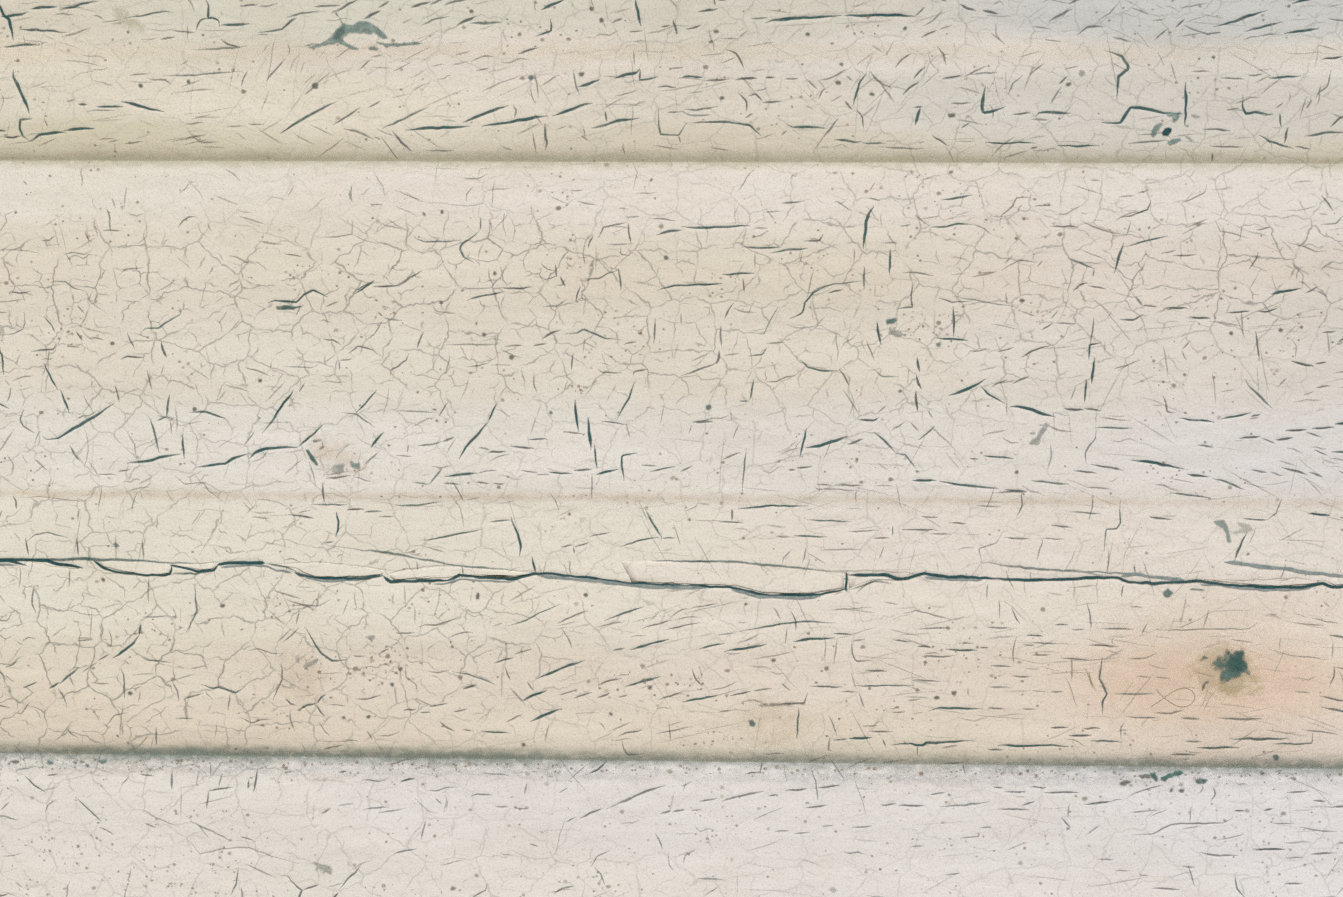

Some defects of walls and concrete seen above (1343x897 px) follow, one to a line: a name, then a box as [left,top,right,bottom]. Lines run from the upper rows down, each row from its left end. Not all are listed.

crack [0,1,163,140]
crack [132,0,495,76]
crack [251,0,1343,160]
crack [271,221,481,304]
crack [588,223,821,373]
crack [792,195,969,375]
crack [0,320,119,459]
crack [121,336,422,471]
crack [725,288,1343,556]
crack [429,520,536,569]
crack [0,625,165,707]
crack [406,608,1343,773]